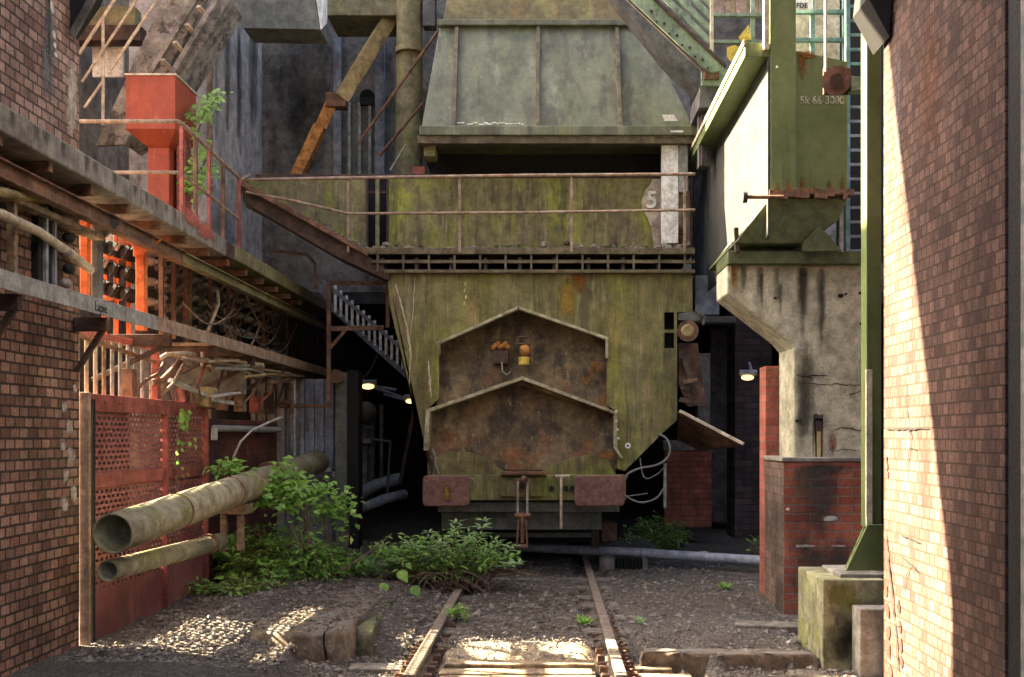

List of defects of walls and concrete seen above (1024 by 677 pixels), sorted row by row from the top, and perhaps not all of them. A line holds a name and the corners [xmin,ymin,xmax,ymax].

rust [798,51,814,75]
damp [758,269,782,302]
damp [798,268,824,326]
damp [799,352,810,426]
crack [796,374,861,398]
crack [834,426,861,451]